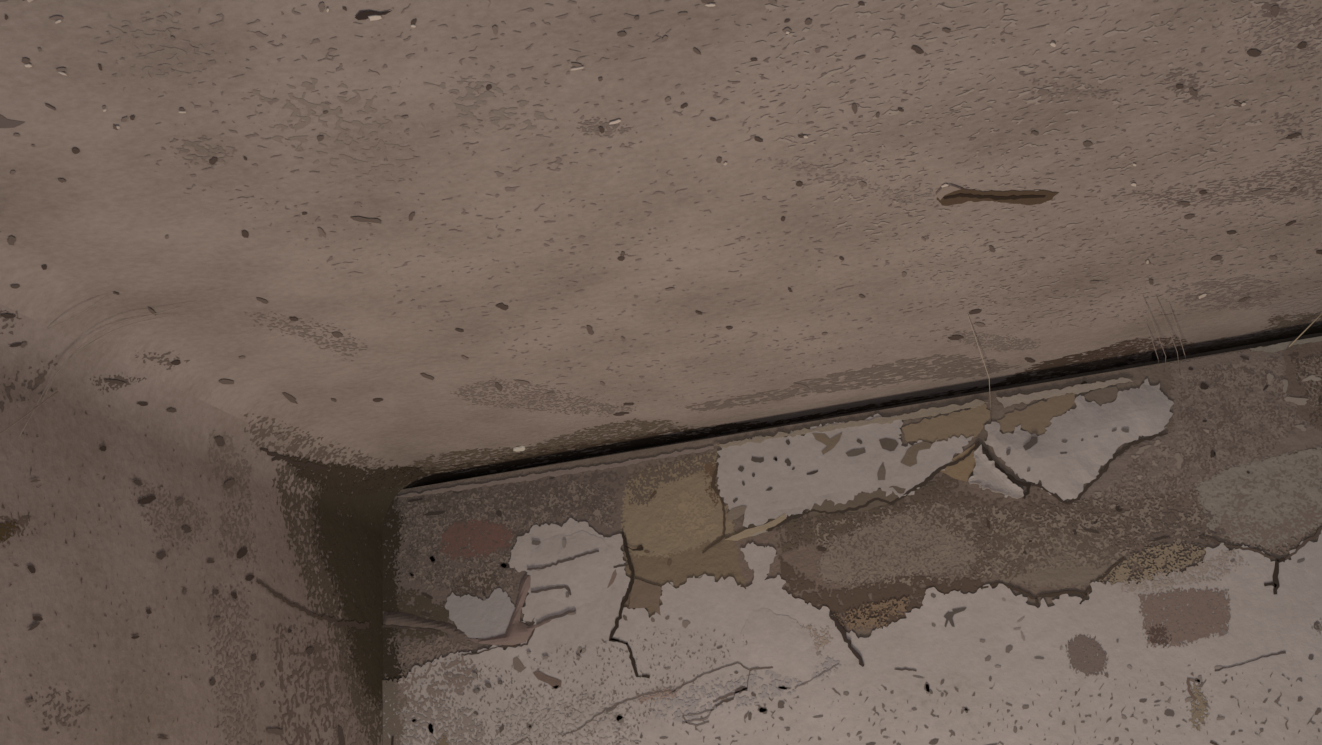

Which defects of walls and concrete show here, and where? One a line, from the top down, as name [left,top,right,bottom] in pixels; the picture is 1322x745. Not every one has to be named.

crack [256,532,864,737]
crack [702,455,726,553]
peeling [382,341,1322,745]
crack [768,433,1168,532]